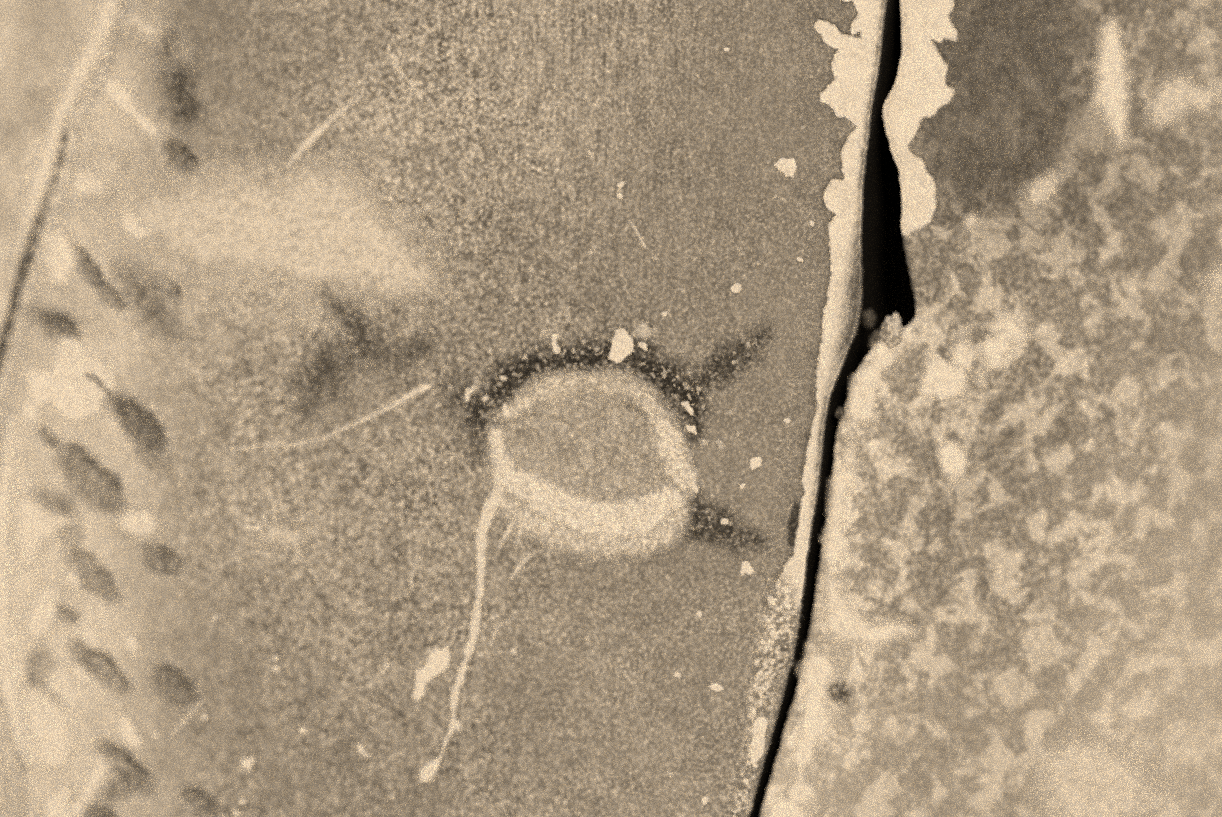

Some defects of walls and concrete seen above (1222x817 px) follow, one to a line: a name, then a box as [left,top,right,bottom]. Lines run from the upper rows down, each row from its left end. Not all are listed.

leakage [74,150,446,412]
leakage [262,524,309,552]
leakage [435,331,770,766]
crack [749,0,916,817]
spalling [732,0,958,817]